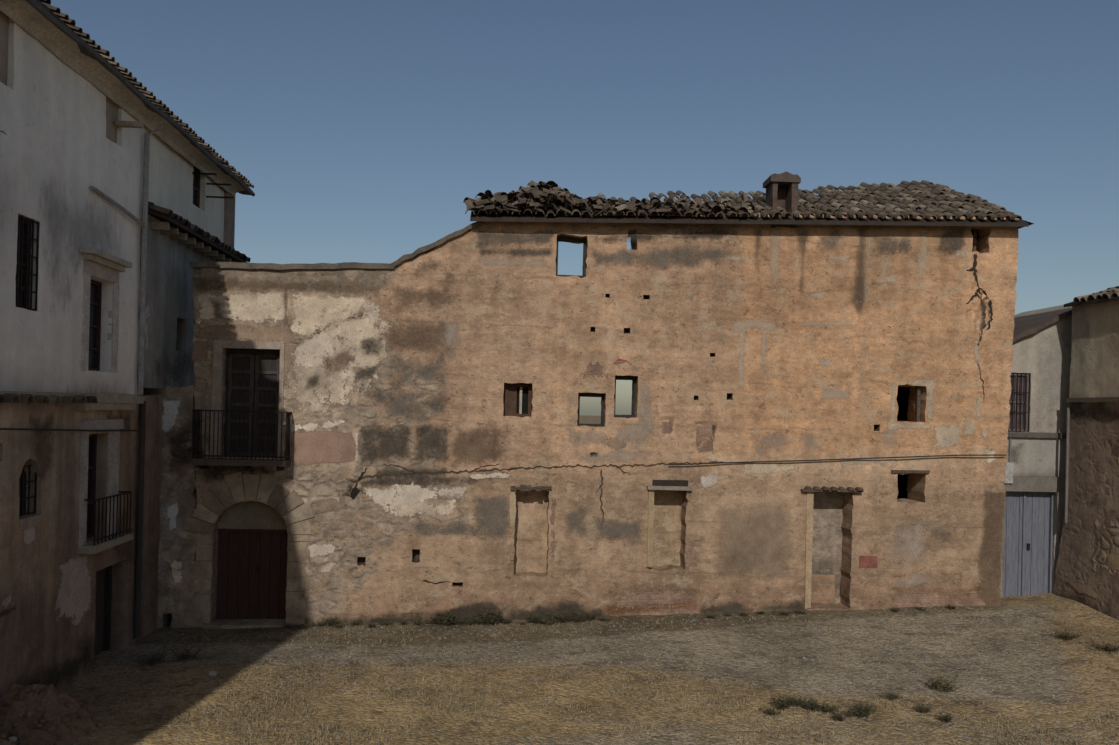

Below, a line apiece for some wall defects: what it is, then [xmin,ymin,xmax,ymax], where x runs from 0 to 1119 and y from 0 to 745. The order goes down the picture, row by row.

crack [966,254,993,396]
flaking render [192,289,509,524]
crack [361,461,723,523]
flaking render [55,553,92,626]
flaking render [304,542,366,576]
flaking render [1088,518,1119,576]